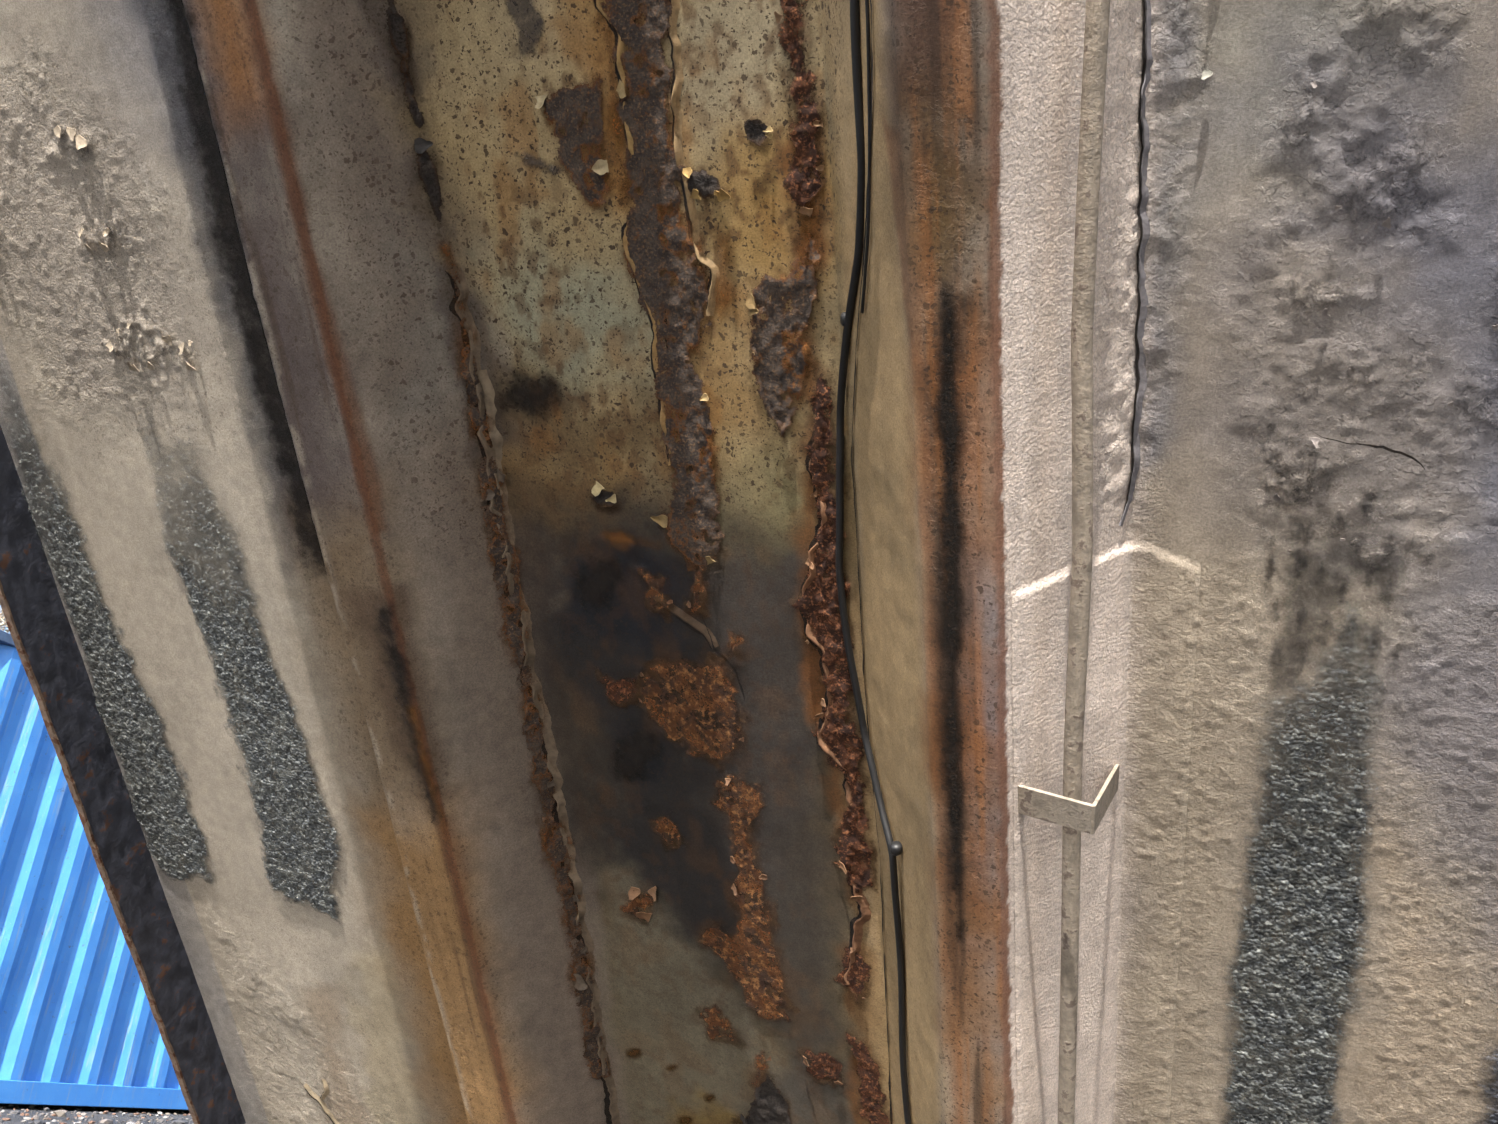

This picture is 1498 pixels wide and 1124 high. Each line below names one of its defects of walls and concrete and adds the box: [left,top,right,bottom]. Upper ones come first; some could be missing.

rust [774,0,824,217]
crack [1201,69,1213,79]
crack [1119,0,1153,526]
rust [791,365,877,1003]
rust [599,632,799,1022]
rust [698,1004,741,1046]
peeling [733,1075,792,1124]
rust [800,1032,892,1124]